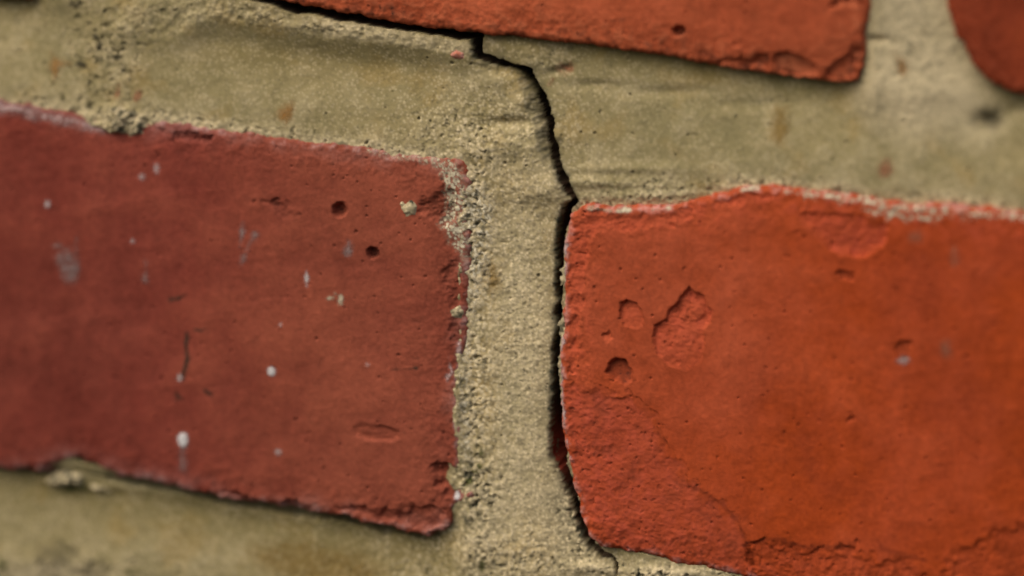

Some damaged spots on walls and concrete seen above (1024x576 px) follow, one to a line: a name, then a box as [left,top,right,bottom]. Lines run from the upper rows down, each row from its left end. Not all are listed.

crack [251,0,619,573]
spalling [562,189,927,576]